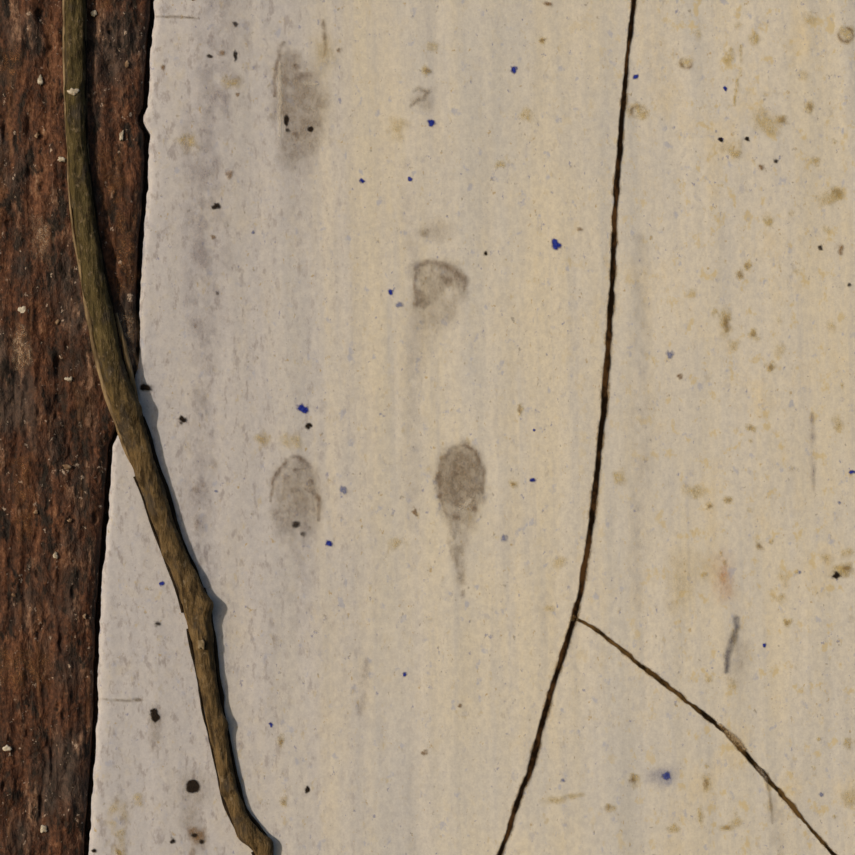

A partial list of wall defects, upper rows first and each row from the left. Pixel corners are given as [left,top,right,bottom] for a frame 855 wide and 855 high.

water stain [278,63,321,140]
crack [497,0,836,855]